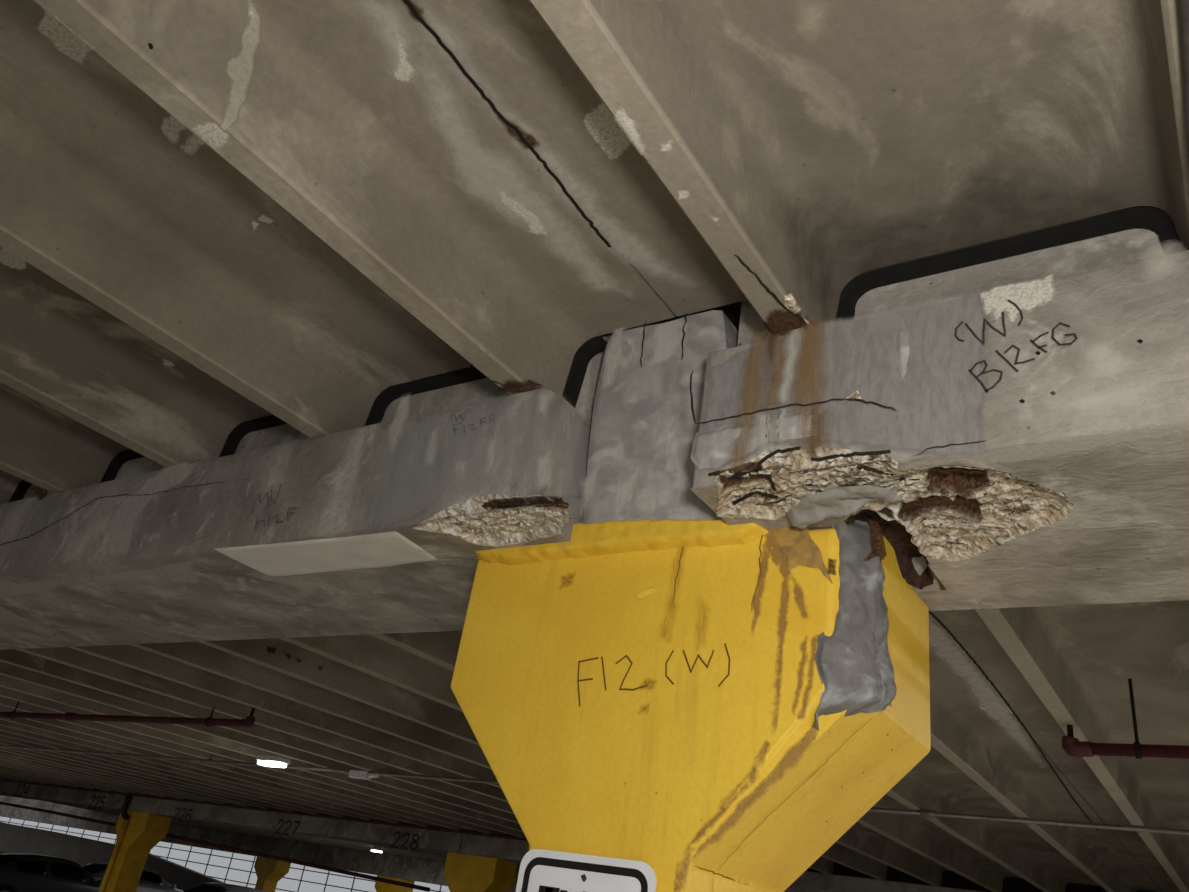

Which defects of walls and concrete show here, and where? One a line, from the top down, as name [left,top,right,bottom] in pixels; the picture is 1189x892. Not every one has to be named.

water stain [363,0,629,295]
crack [402,0,612,248]
water stain [495,104,678,278]
rust [734,322,824,468]
crack [0,482,222,545]
spalling [411,493,572,547]
rust [863,520,887,561]
spalling [708,446,1074,726]
peeling [675,637,817,892]
crack [929,611,1099,831]